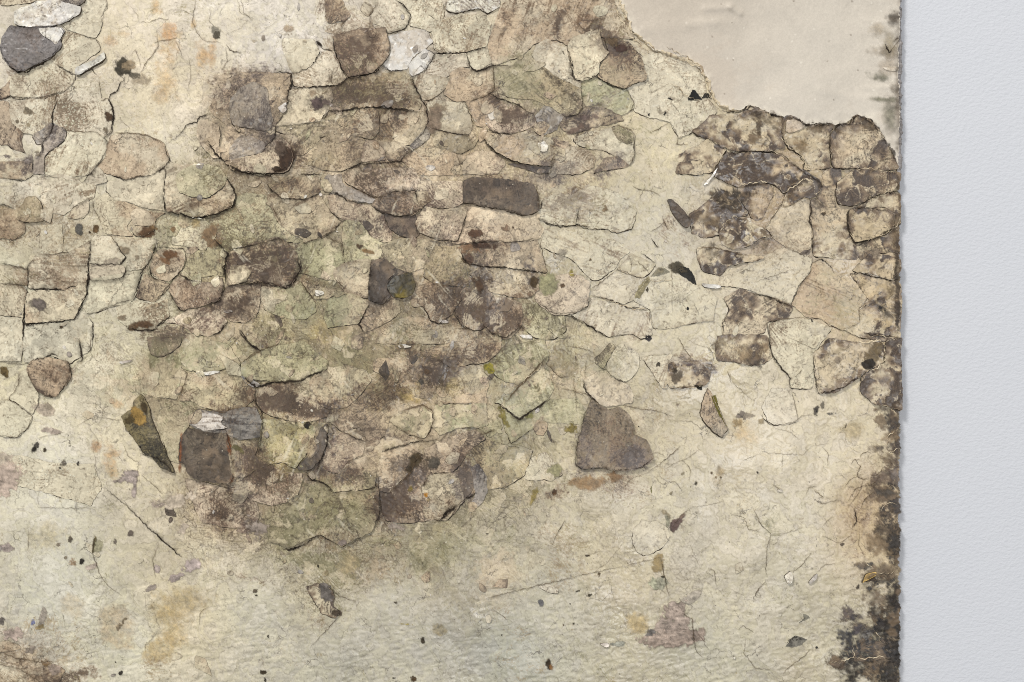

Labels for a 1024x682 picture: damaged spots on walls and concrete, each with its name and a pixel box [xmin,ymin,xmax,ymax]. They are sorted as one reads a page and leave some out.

leakage [748,111,775,144]
crack [1,8,532,447]
peeling [0,0,903,564]
crack [446,189,628,273]
leakage [703,188,757,228]
crack [562,51,898,412]
leakage [879,182,902,327]
crack [467,360,598,435]
peeling [137,559,201,592]
peeling [306,571,342,618]
leakage [827,393,901,682]
peeling [0,663,65,682]